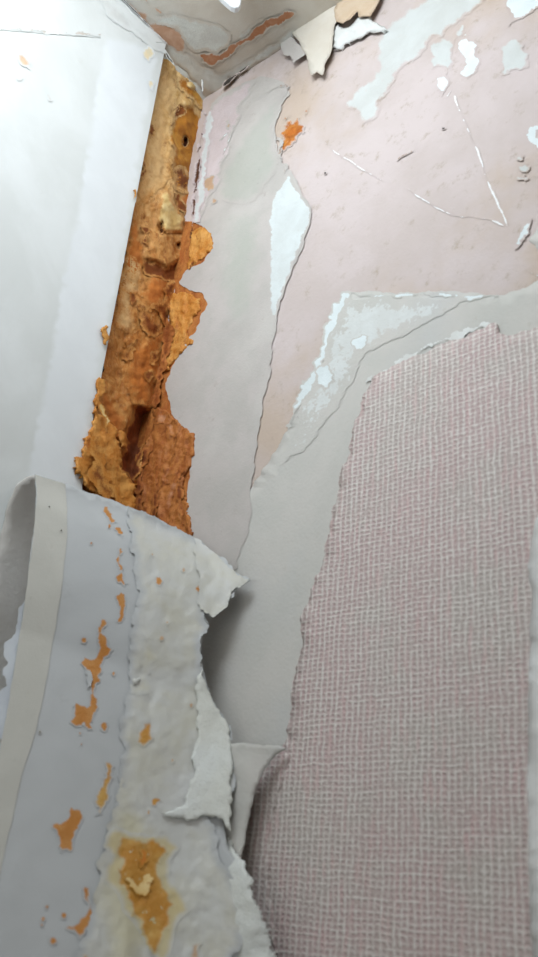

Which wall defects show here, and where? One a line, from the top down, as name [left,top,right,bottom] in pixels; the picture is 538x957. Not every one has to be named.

peeling [280,0,484,124]
peeling [499,0,538,76]
corrosion [279,109,308,152]
peeling [523,125,538,148]